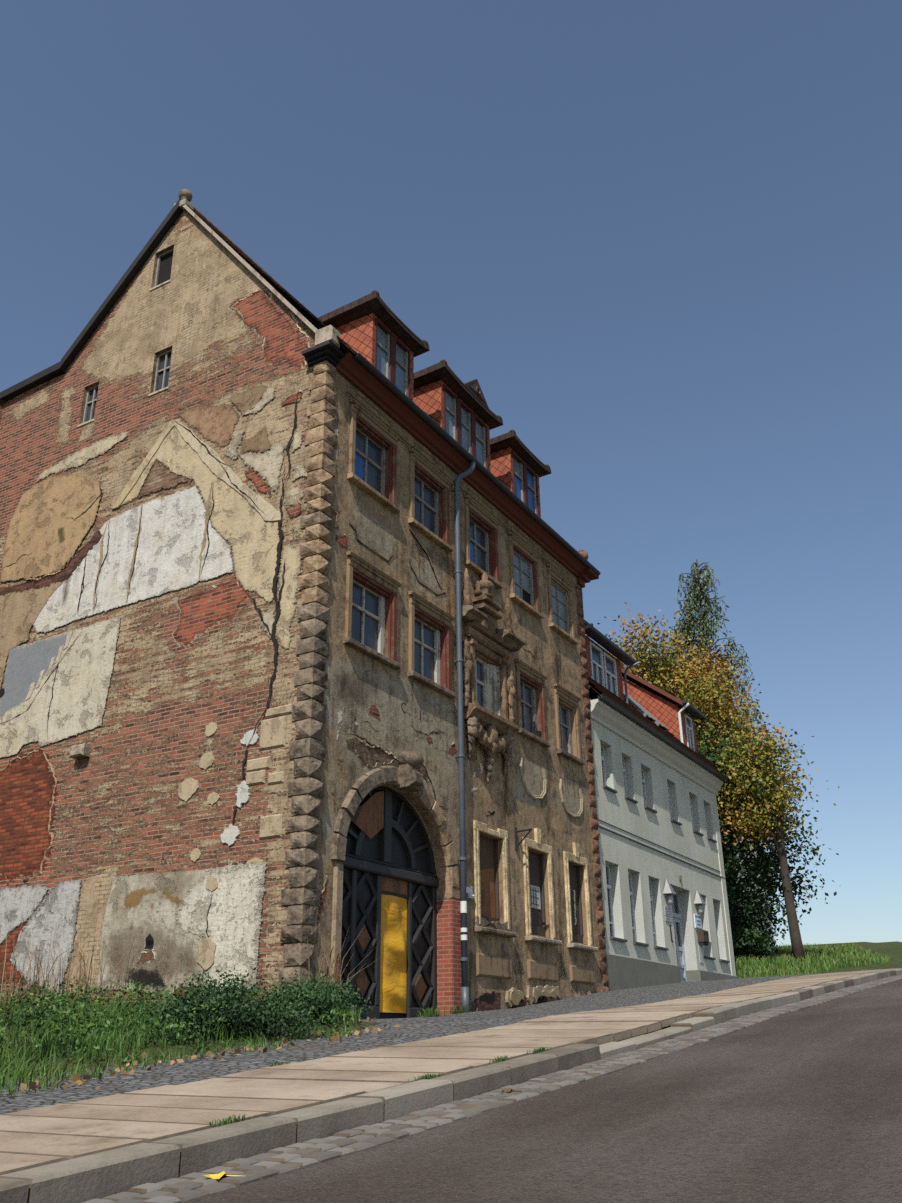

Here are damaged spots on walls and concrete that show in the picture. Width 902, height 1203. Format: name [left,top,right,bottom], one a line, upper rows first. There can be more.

spalling [230,289,313,370]
spalling [171,577,247,649]
crack [172,390,299,824]
spalling [336,705,399,769]
spalling [0,748,61,998]
spalling [471,991,548,1012]